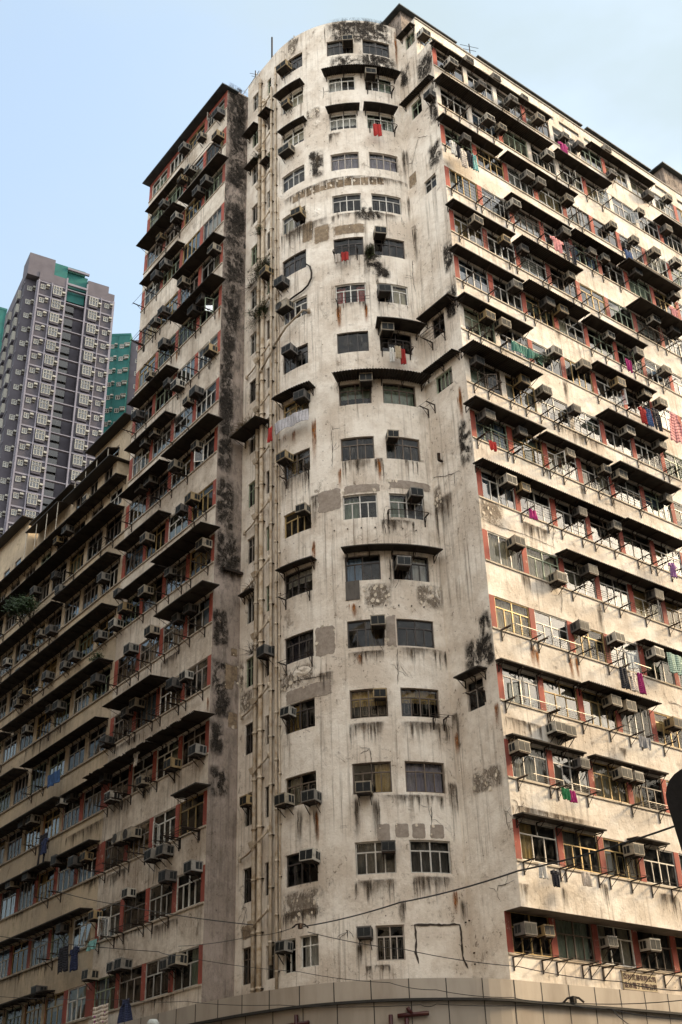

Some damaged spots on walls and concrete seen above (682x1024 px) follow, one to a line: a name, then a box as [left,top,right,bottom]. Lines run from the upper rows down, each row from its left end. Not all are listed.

water stain [324,19,390,43]
water stain [288,152,406,199]
water stain [365,245,389,282]
water stain [216,204,246,579]
water stain [459,421,472,464]
spalling [318,479,442,513]
water stain [213,609,228,645]
peeling [364,584,397,649]
peeling [418,585,442,608]
water stain [466,611,494,669]
spalling [281,624,336,705]
peeling [472,765,501,793]